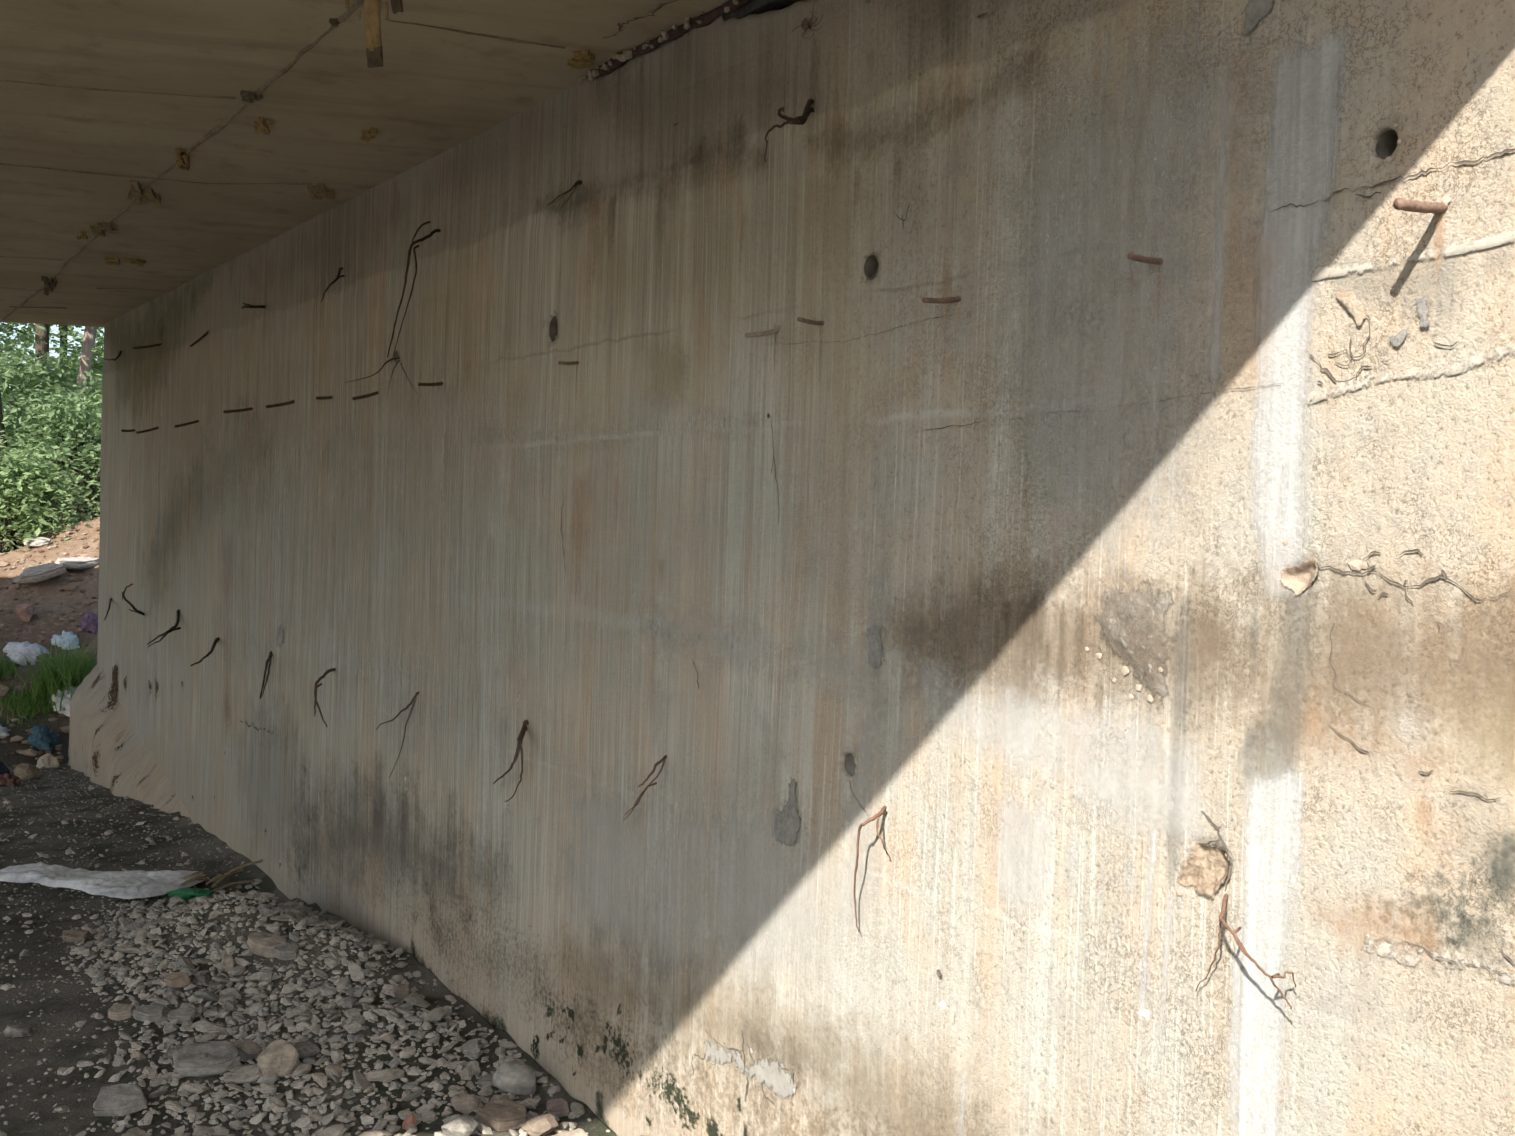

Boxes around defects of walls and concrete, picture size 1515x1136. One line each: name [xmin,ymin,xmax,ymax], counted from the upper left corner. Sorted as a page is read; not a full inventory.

crack [1272,148,1515,212]
spalling [1335,289,1366,326]
crack [1318,549,1512,632]
crack [1328,624,1371,754]